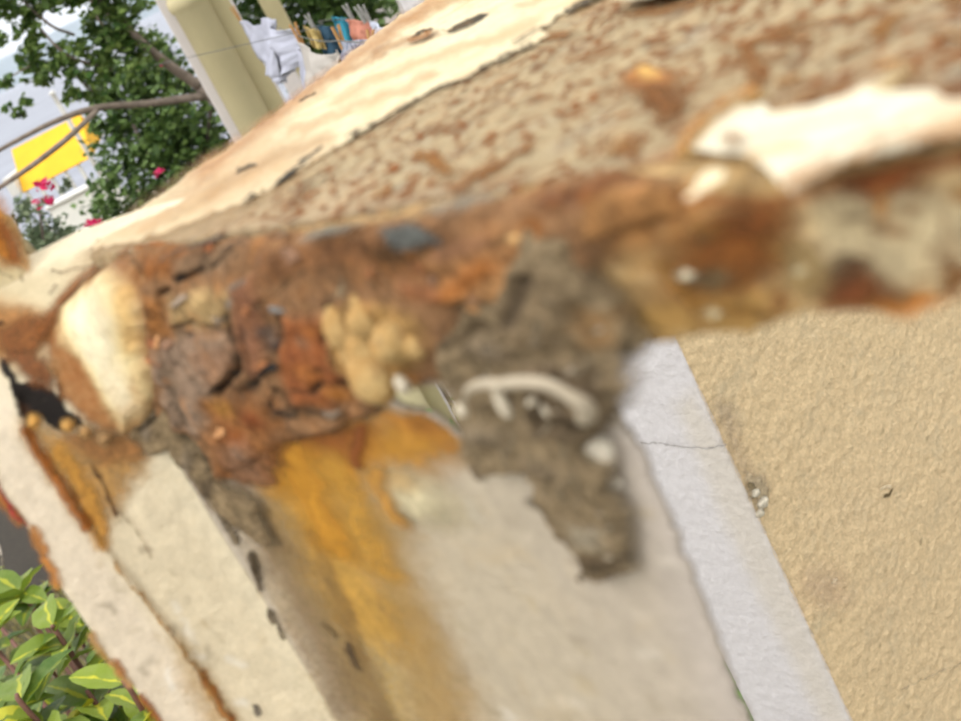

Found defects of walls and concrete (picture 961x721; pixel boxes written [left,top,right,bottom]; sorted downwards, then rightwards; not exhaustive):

peeling [92,0,597,253]
rust [237,0,961,239]
peeling [677,57,961,193]
peeling [683,168,727,200]
peeling [455,402,469,418]
peeling [491,391,513,419]
peeling [526,397,550,417]
peeling [582,435,621,489]
rust [266,410,462,721]